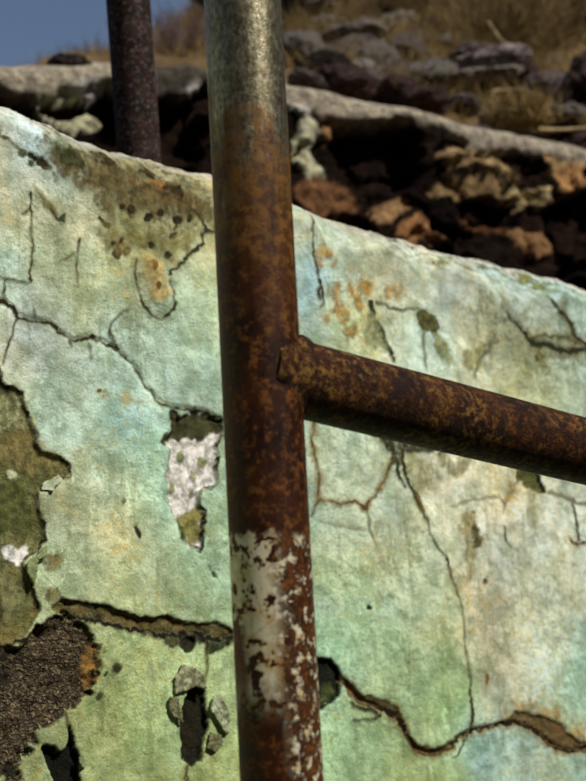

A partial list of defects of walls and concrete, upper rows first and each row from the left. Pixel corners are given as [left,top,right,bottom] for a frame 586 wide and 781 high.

rust [314,244,336,266]
crack [0,186,218,421]
rust [325,278,373,337]
crack [365,300,440,367]
crack [474,340,500,376]
crack [507,296,586,360]
peeling [161,407,224,551]
peeling [0,370,123,781]
crack [310,422,586,758]
spalling [168,641,231,781]
spalling [317,658,341,709]